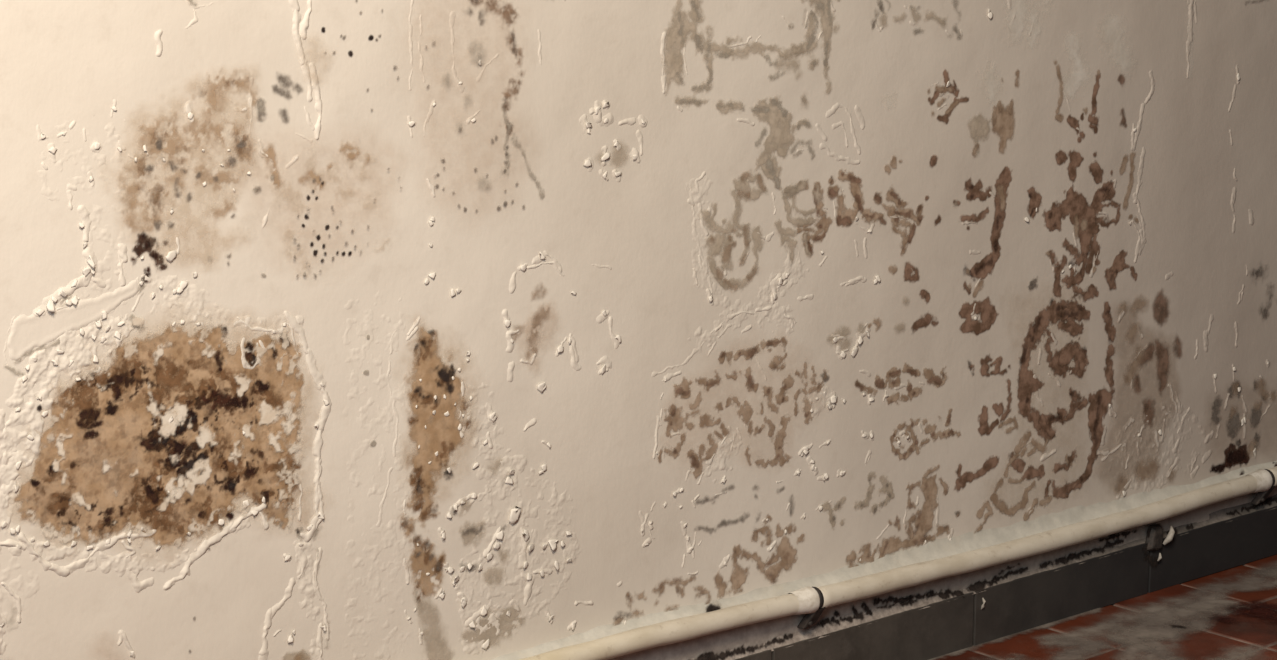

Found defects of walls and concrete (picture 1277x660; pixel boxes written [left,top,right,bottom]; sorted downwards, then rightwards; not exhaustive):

leakage [449,0,515,93]
leakage [117,77,299,239]
leakage [273,76,315,144]
leakage [492,81,525,173]
leakage [294,165,369,277]
peeling [615,0,1147,625]
flaking render [0,99,332,660]